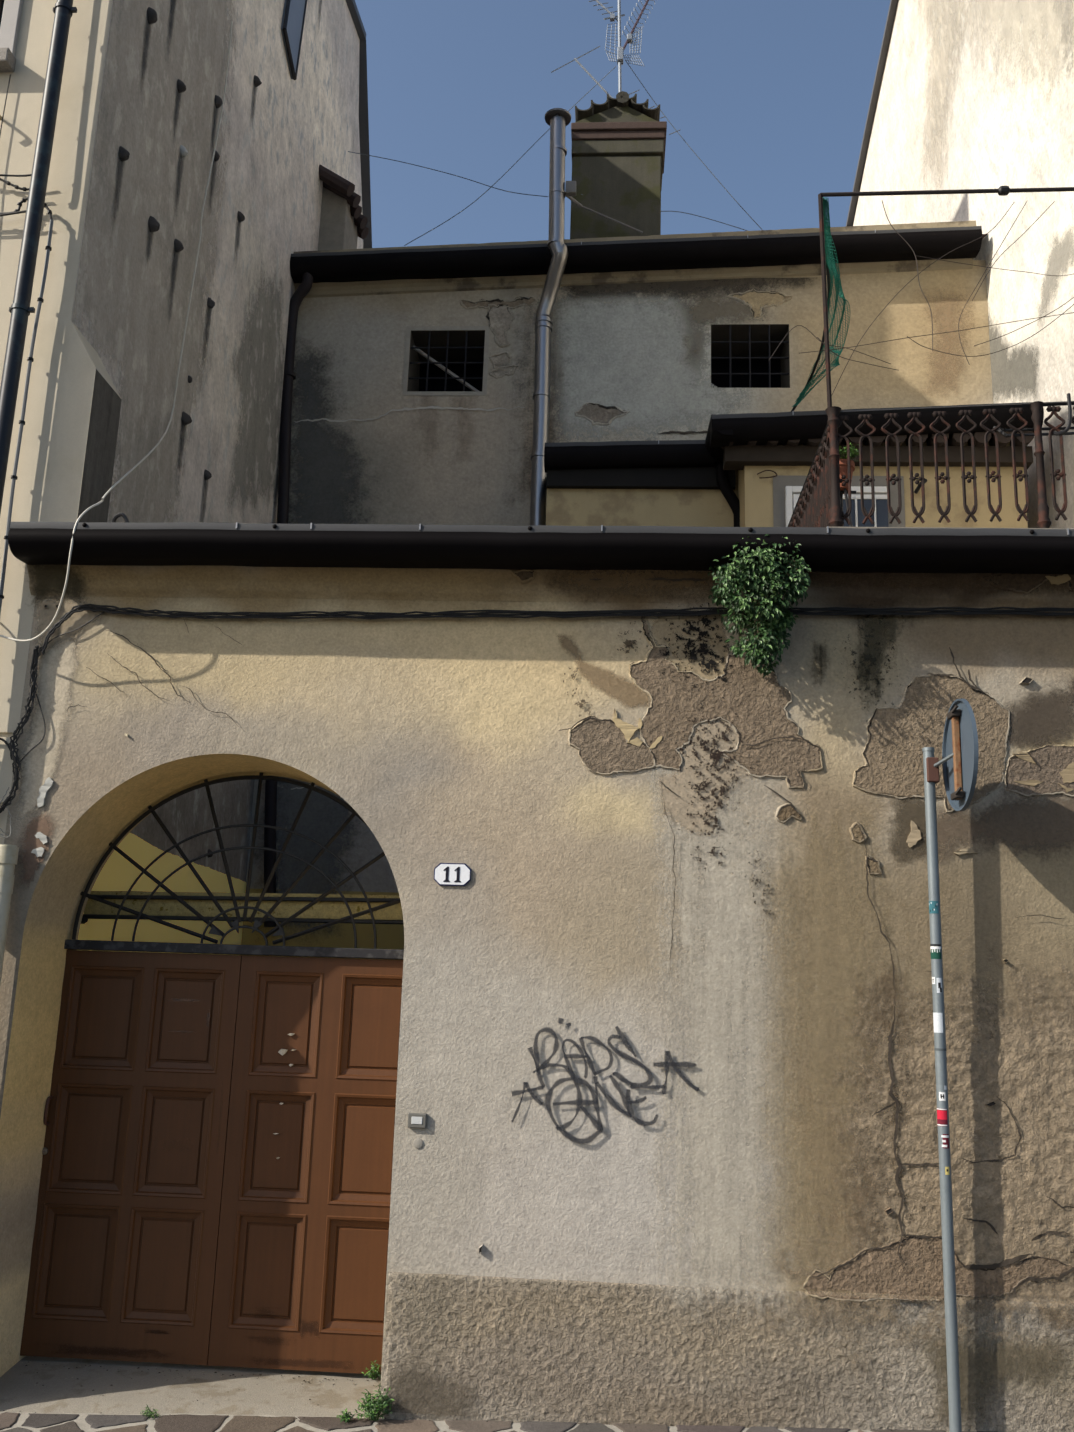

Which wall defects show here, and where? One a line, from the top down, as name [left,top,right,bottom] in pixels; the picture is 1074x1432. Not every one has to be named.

damp [72,0,236,523]
damp [231,278,367,524]
flaking render [574,402,629,426]
damp [930,297,964,387]
damp [988,317,1038,400]
damp [1039,230,1074,320]
crack [67,630,244,731]
flaking render [568,616,823,824]
damp [804,571,1002,722]
flaking render [852,674,1074,813]
flaking render [906,820,922,847]
crack [809,825,1074,1293]